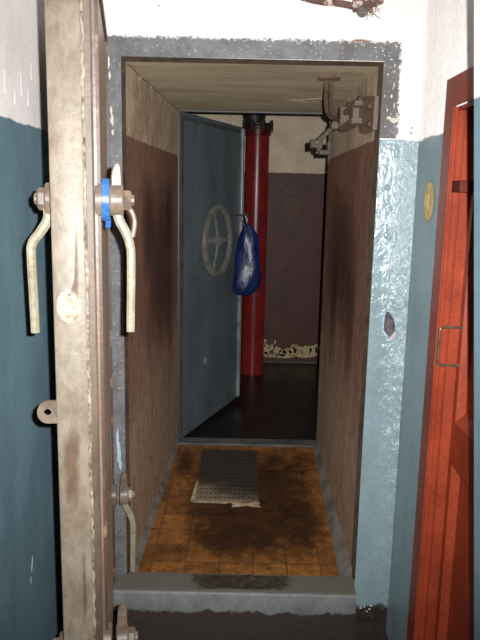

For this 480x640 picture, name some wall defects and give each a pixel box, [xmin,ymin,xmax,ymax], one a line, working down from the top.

hole [382,305,398,341]
water stain [190,456,319,554]
water stain [207,575,285,588]